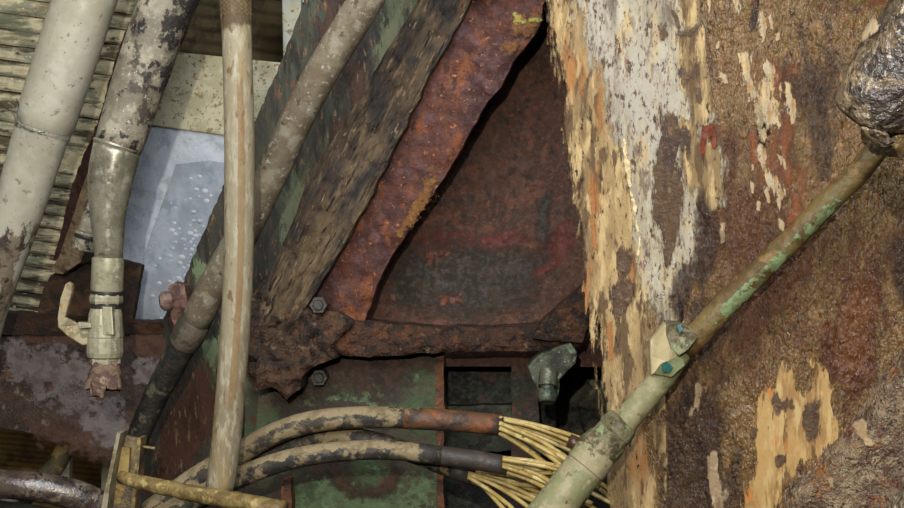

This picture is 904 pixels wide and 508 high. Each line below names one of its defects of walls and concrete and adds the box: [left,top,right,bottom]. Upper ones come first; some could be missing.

corrosion [309,0,345,49]
corrosion [500,9,540,54]
peeling [756,11,780,43]
peeling [738,52,798,231]
corrosion [396,165,443,244]
peeling [546,0,729,417]
peeling [712,194,843,324]
corrosion [269,352,446,409]
corrosion [436,474,446,508]
peeling [607,395,668,508]
peeling [707,450,729,508]
spalling [740,357,875,508]